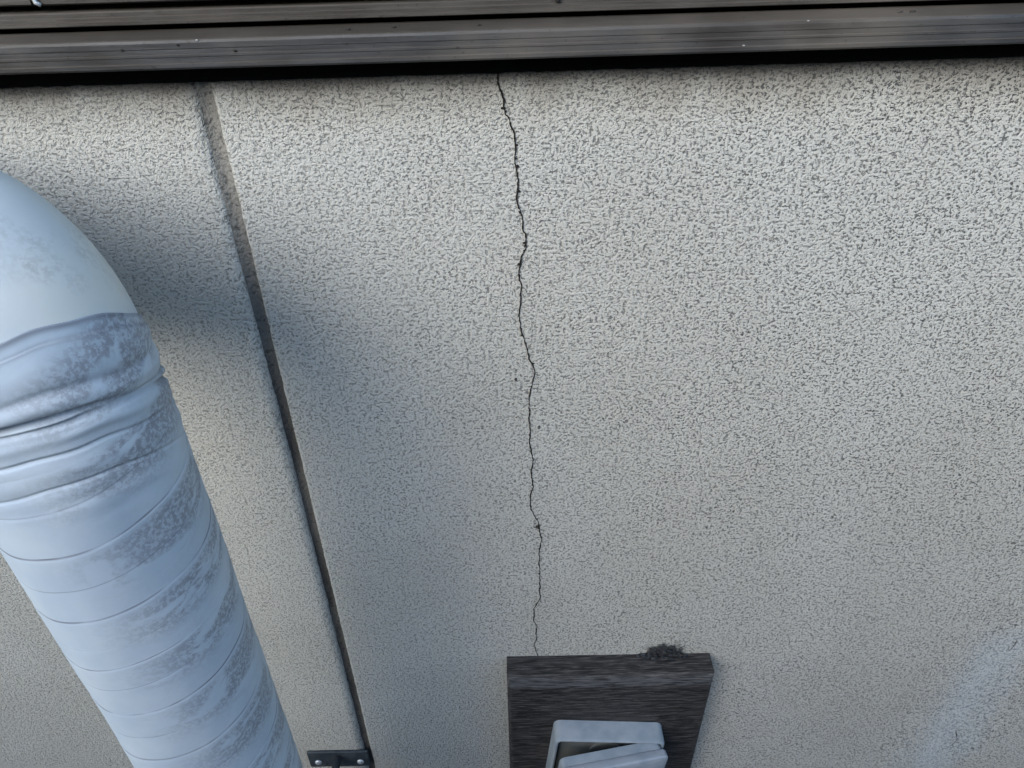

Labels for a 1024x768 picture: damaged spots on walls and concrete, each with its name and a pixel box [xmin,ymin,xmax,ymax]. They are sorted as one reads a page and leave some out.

crack [497,73,542,656]